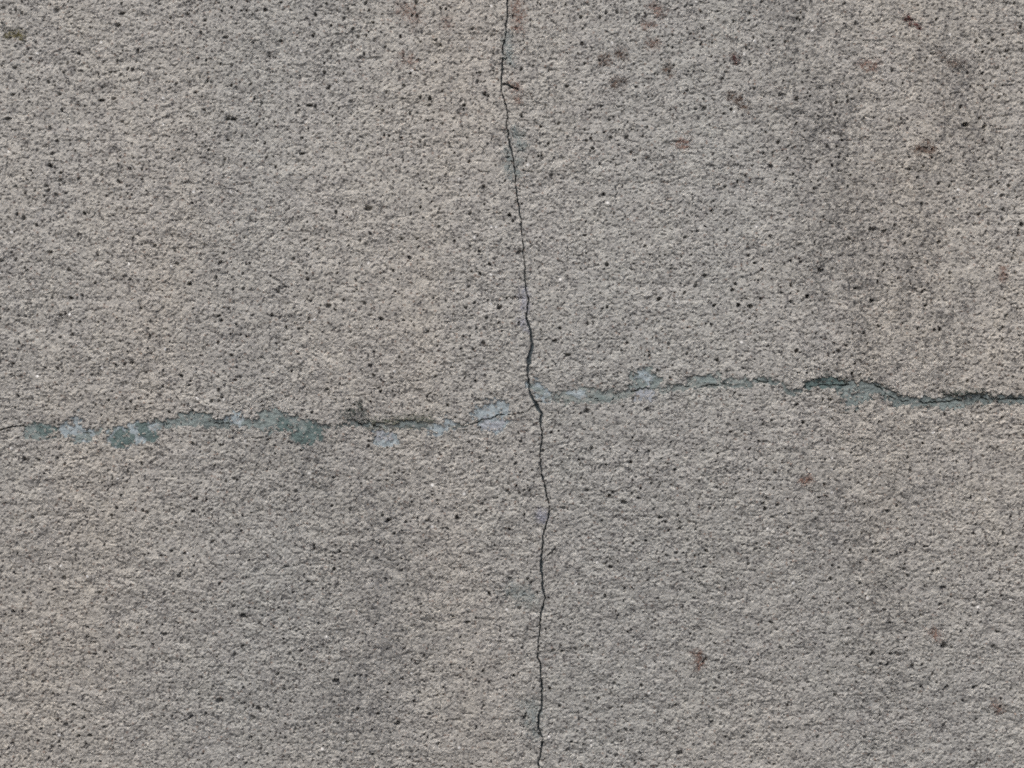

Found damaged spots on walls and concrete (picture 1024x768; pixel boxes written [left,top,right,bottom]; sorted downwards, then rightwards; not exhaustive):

peeling [525,364,663,404]
crack [276,0,1024,768]
peeling [687,371,758,390]
peeling [805,377,1024,411]
crack [0,419,257,438]
peeling [23,405,326,449]
peeling [370,397,513,447]